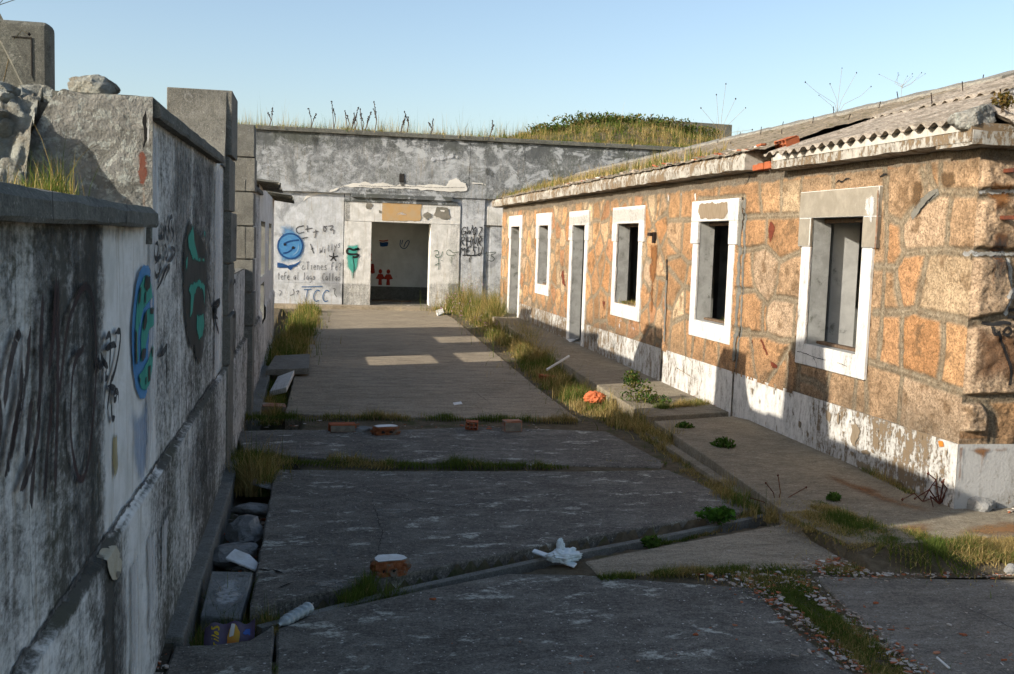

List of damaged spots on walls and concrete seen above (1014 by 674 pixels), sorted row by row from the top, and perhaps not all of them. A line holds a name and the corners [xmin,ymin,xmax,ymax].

corrosion [990,183,1013,207]
peeling [812,408,878,473]